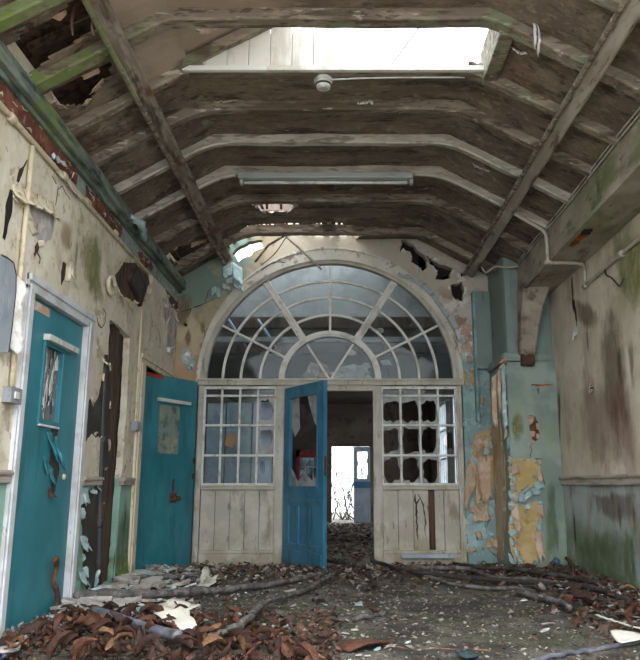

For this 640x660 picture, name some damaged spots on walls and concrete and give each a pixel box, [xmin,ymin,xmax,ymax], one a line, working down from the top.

spalling [0,83,122,248]
spalling [106,252,155,312]
peeling [396,242,546,573]
flaking render [79,485,102,590]